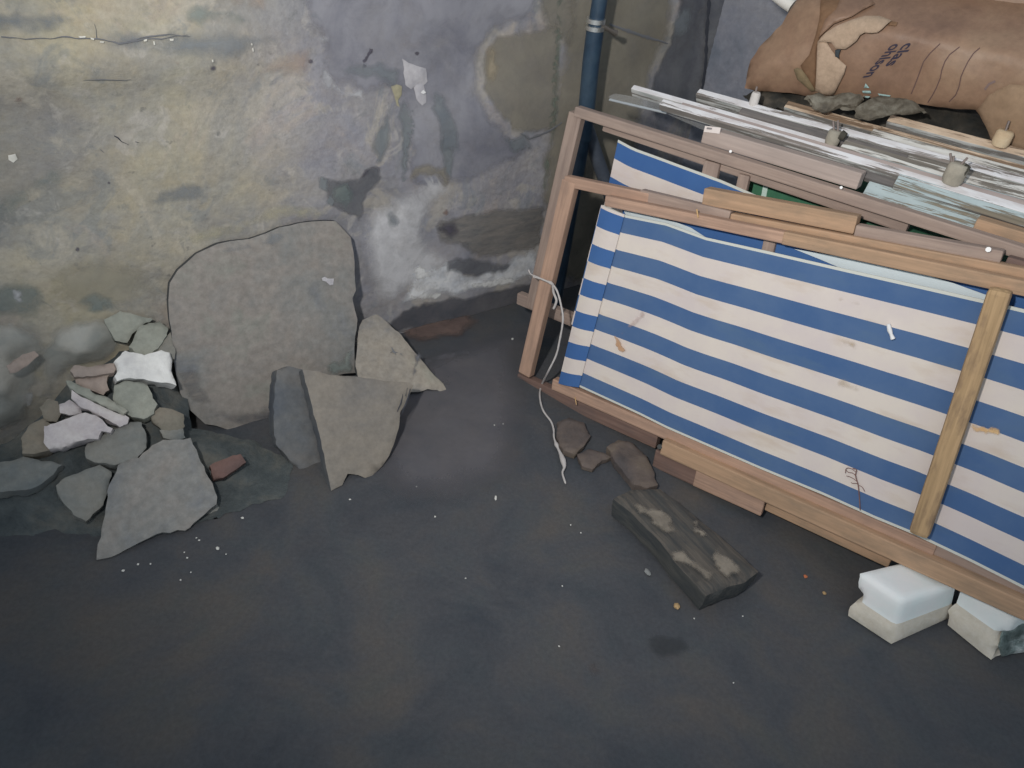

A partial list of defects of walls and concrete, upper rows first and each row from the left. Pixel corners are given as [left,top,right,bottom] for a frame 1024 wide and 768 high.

crack [1,24,190,45]
damp [309,0,574,331]
flaking render [320,167,380,218]